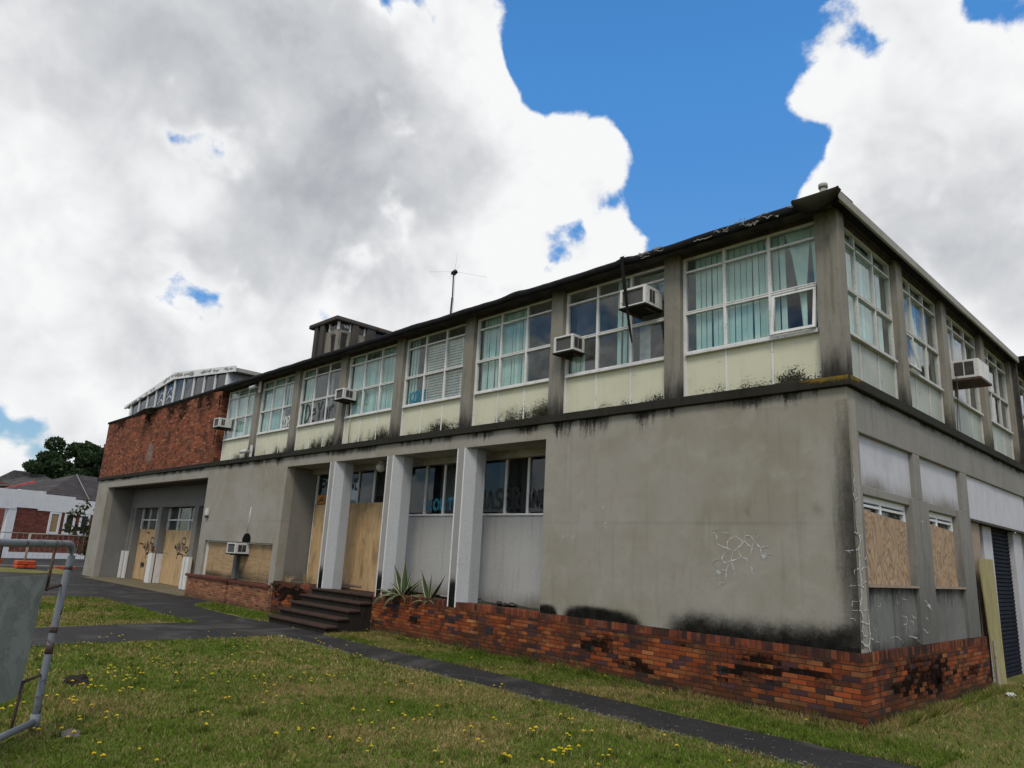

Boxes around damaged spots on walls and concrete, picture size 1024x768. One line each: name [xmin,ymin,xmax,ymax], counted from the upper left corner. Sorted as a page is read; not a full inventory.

crack [709,523,772,583]
crack [845,468,931,652]
damp [540,605,639,625]
damp [673,617,879,653]